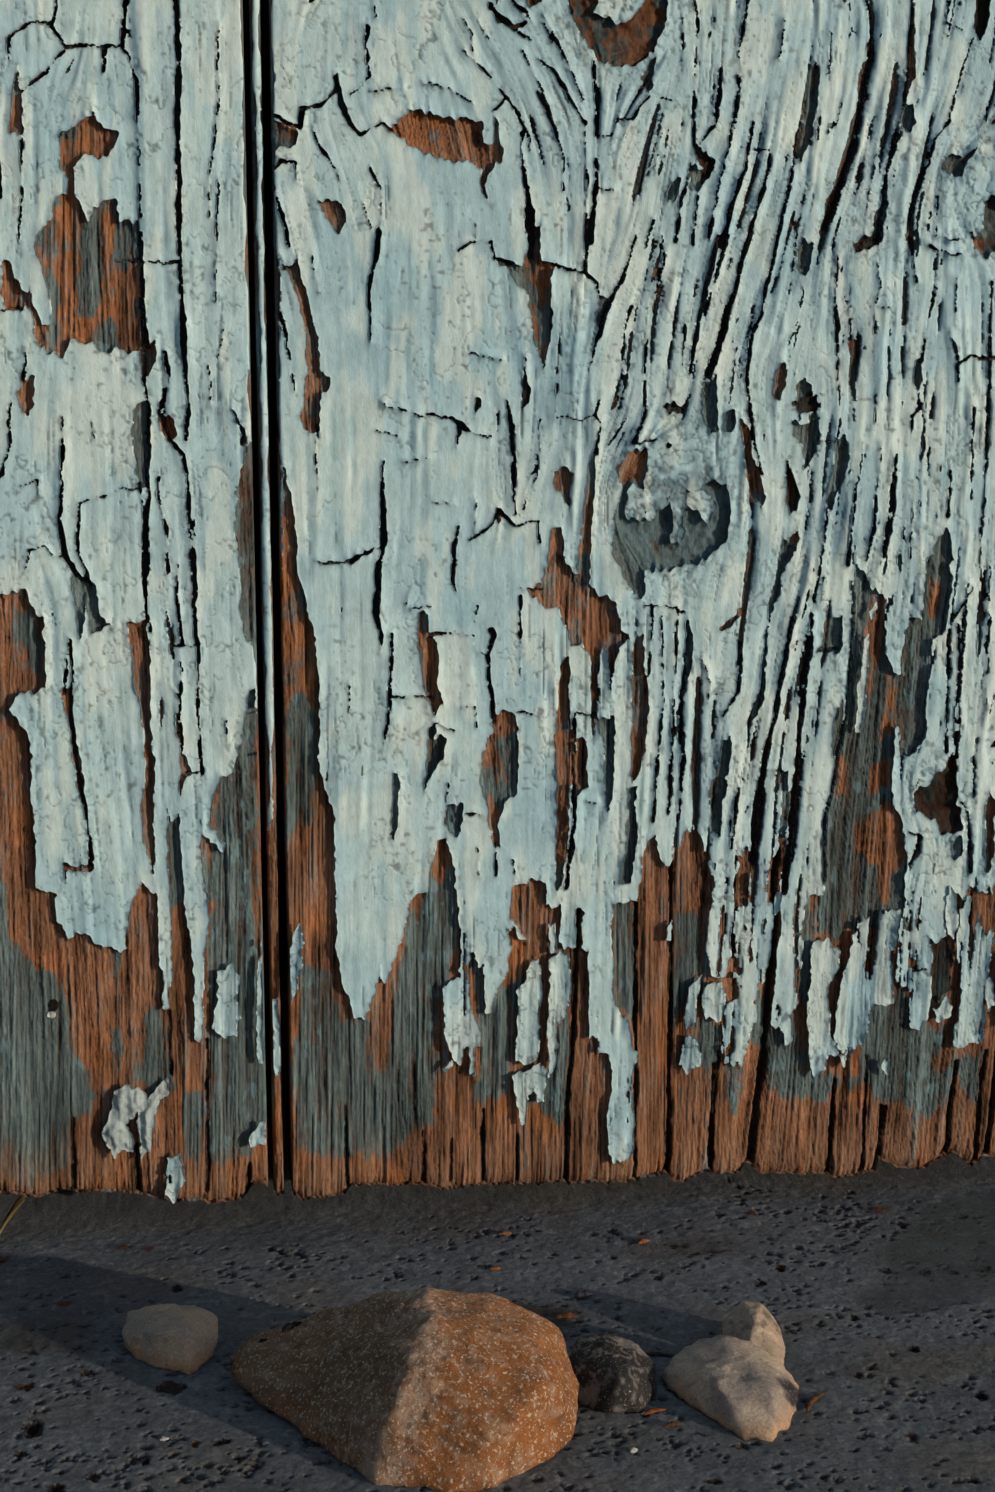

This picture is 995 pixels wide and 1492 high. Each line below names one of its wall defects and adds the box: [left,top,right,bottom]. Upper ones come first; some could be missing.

peeling [1,111,157,377]
crack [0,0,228,777]
crack [279,310,295,391]
crack [274,5,393,340]
peeling [389,109,504,199]
peeling [568,0,668,91]
peeling [701,370,766,506]
peeling [773,362,849,513]
peeling [970,195,995,259]
crack [318,0,995,1187]
crack [62,639,94,869]
peeling [0,396,995,1204]